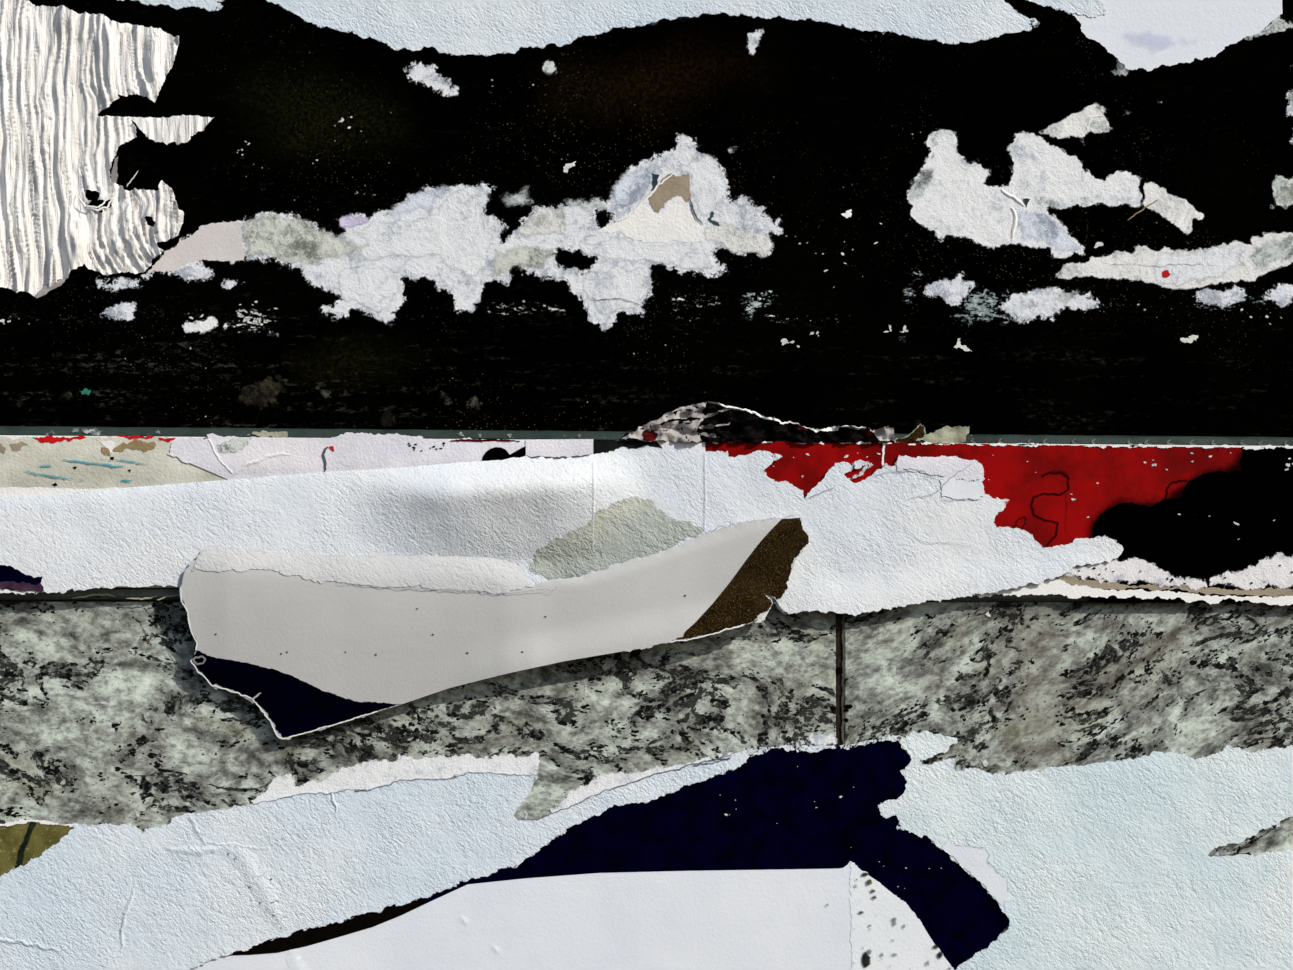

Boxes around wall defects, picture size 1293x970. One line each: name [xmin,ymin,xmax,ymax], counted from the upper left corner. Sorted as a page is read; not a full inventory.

peeling [233,301,278,333]
peeling [741,290,819,348]
peeling [955,289,1009,325]
peeling [908,441,1293,470]